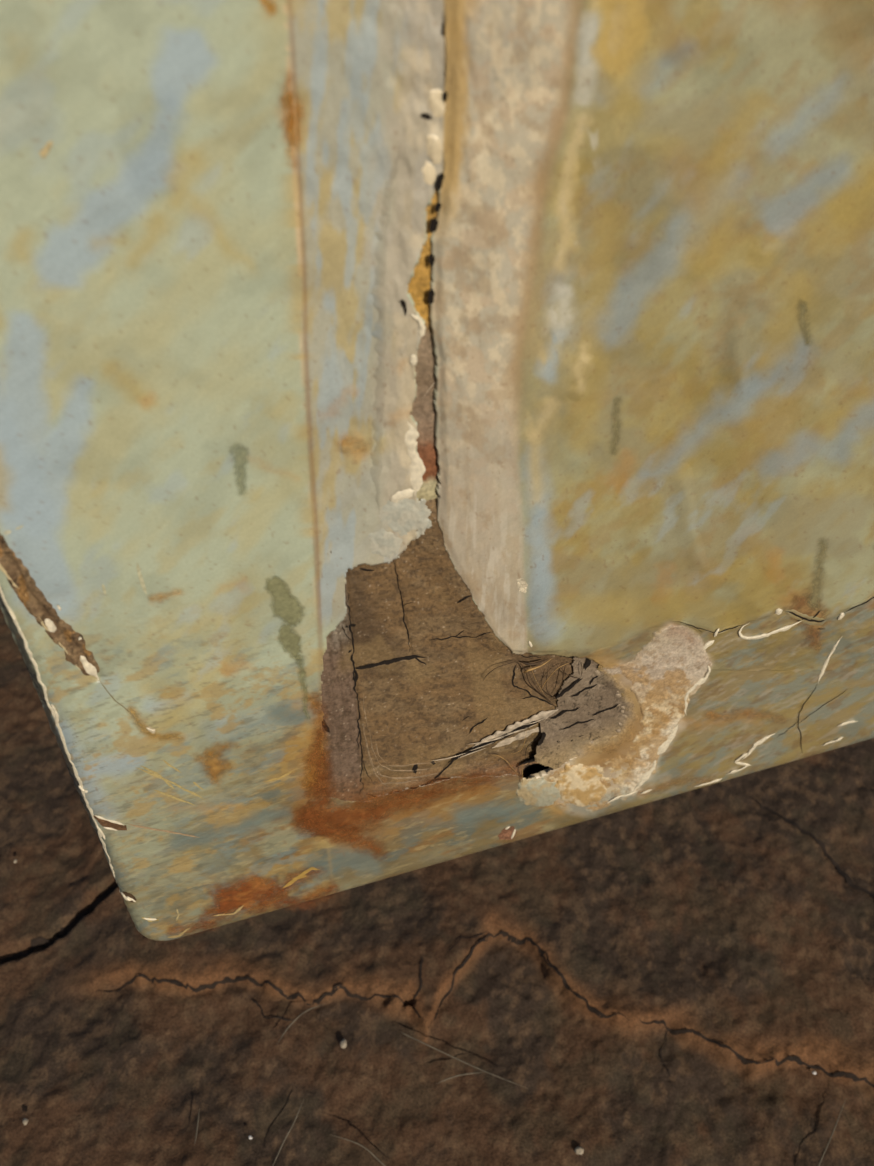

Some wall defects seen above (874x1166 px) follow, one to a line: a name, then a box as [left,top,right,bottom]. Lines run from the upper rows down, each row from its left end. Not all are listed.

crack [390,22,448,503]
water stain [233,446,247,494]
rust [0,534,177,739]
water stain [267,576,307,714]
spalling [320,498,719,814]
crack [672,620,746,635]
peeling [738,608,803,640]
crack [786,595,874,630]
crack [780,684,849,754]
rust [297,729,486,854]
peeling [695,733,775,787]
rust [172,872,336,932]